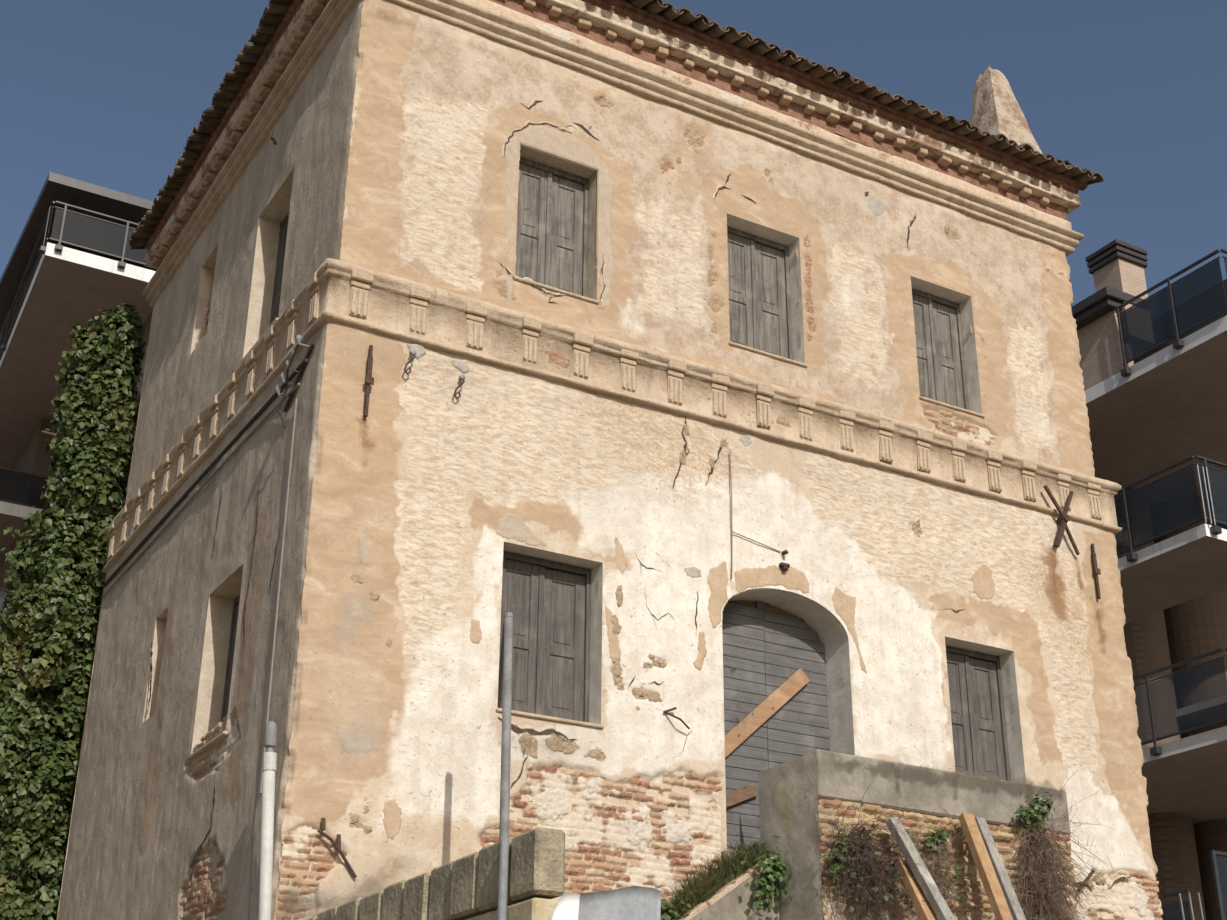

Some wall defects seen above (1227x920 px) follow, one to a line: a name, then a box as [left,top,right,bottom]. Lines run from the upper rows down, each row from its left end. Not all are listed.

crack [501,98,599,157]
crack [713,174,757,204]
crack [673,416,728,488]
flaking render [924,409,998,446]
flaking render [605,537,663,711]
flaking render [642,654,667,669]
peeling [693,561,810,670]
peeling [832,587,867,674]
flaking render [180,840,227,920]
flaking render [276,819,347,920]
flaking render [479,762,722,903]
flaking render [1078,867,1163,920]